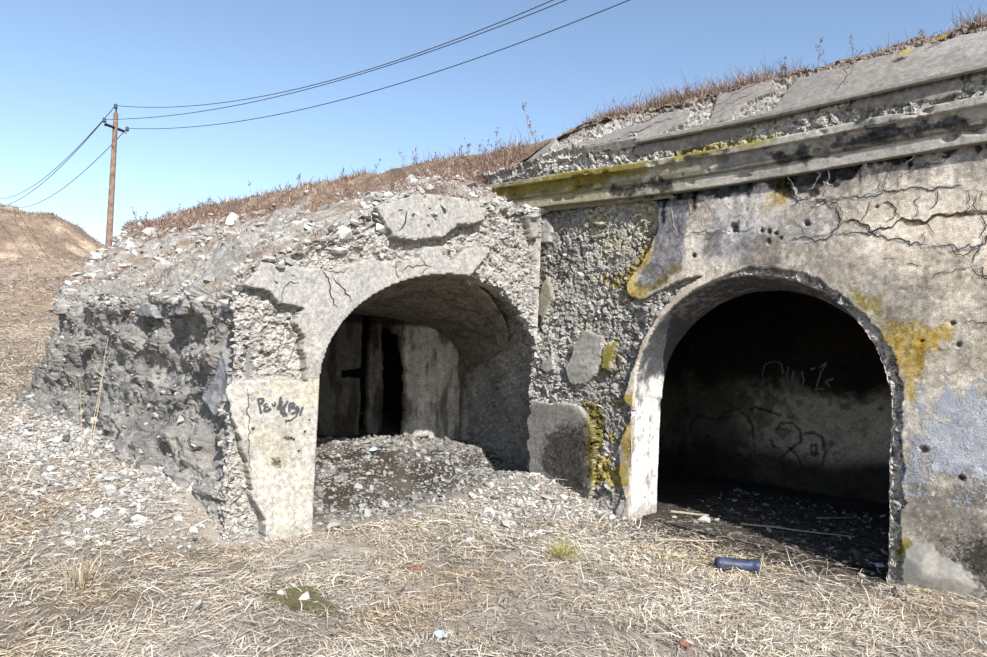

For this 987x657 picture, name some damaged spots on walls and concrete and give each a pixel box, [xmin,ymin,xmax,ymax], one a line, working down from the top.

leakage [833,114,967,151]
crack [678,190,756,237]
leakage [610,145,958,260]
crack [786,147,987,279]
crack [322,268,351,308]
spalling [15,194,987,584]
leakage [541,422,600,500]
leakage [940,535,987,589]